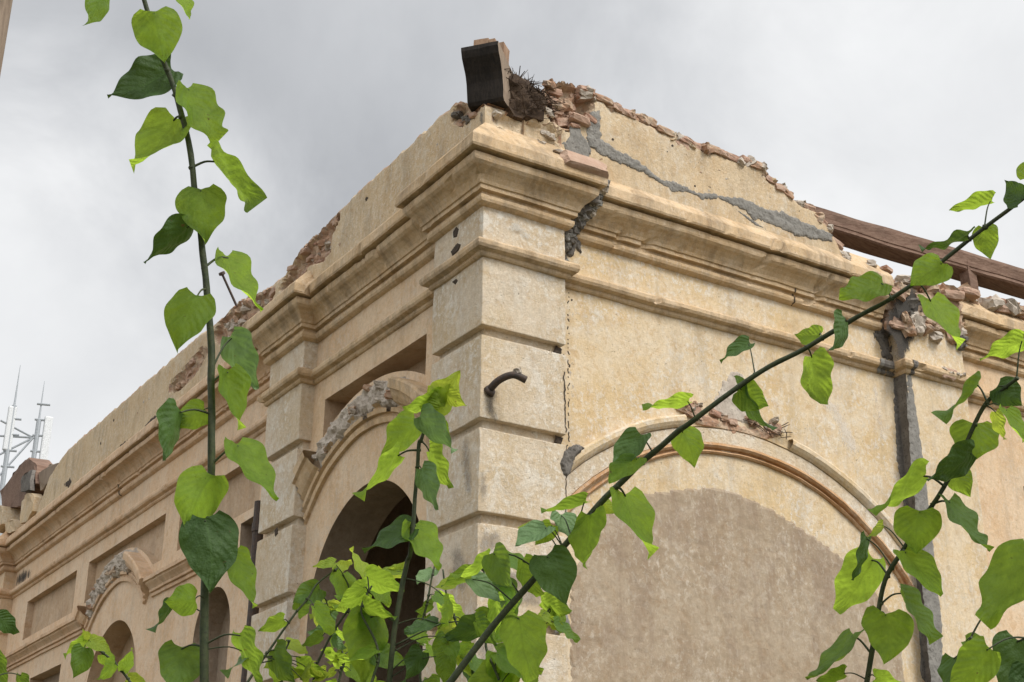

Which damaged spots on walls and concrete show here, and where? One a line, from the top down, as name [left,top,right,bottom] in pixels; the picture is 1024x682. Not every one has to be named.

flaking render [451,78,610,262]
crack [562,110,833,242]
spalling [287,217,341,285]
spalling [216,286,275,339]
peeling [901,298,969,351]
spalling [170,348,208,393]
spalling [311,376,409,468]
spalling [676,372,793,440]
spalling [85,547,139,619]